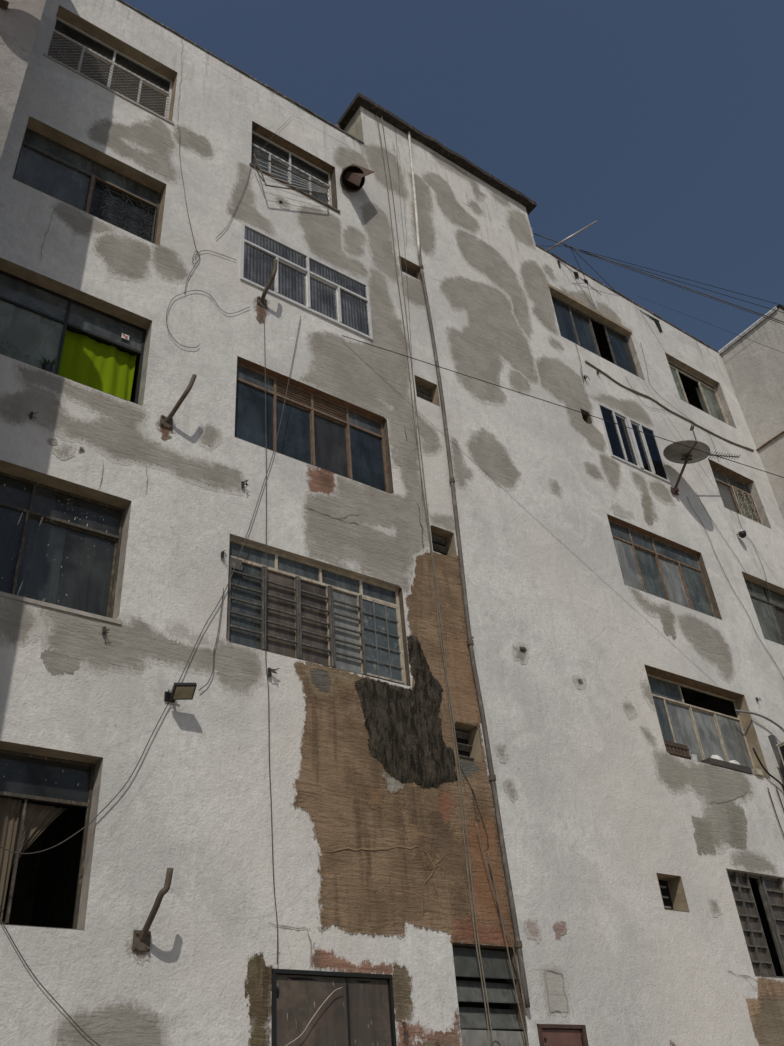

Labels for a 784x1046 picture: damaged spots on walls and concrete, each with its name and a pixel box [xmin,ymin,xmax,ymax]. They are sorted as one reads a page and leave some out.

peeling [306,463,336,495]
peeling [290,550,567,1046]
damp [652,746,779,876]
peeling [244,952,274,1046]
peeling [746,977,784,1046]